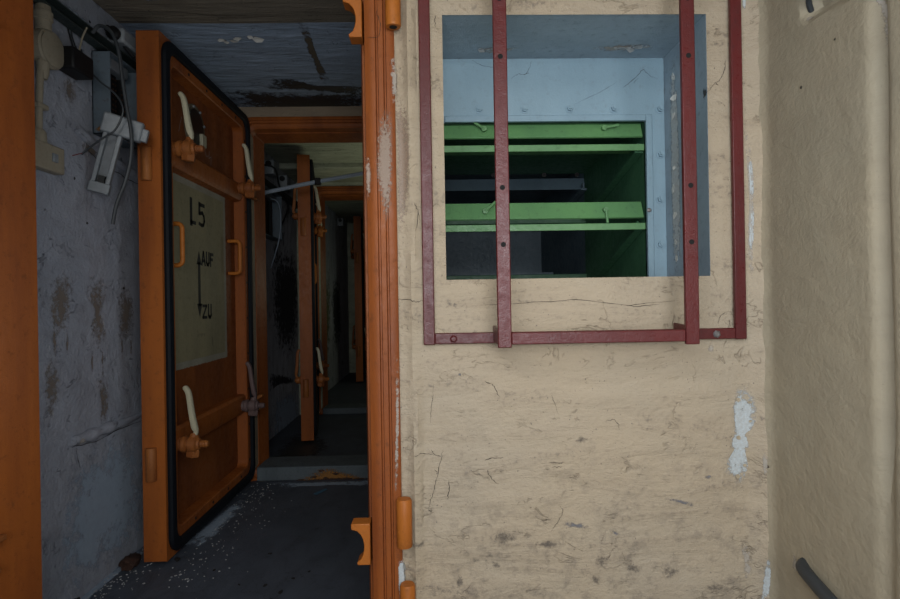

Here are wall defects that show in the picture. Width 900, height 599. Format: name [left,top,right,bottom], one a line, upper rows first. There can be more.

water stain [232,28,362,107]
peeling [727,391,755,479]